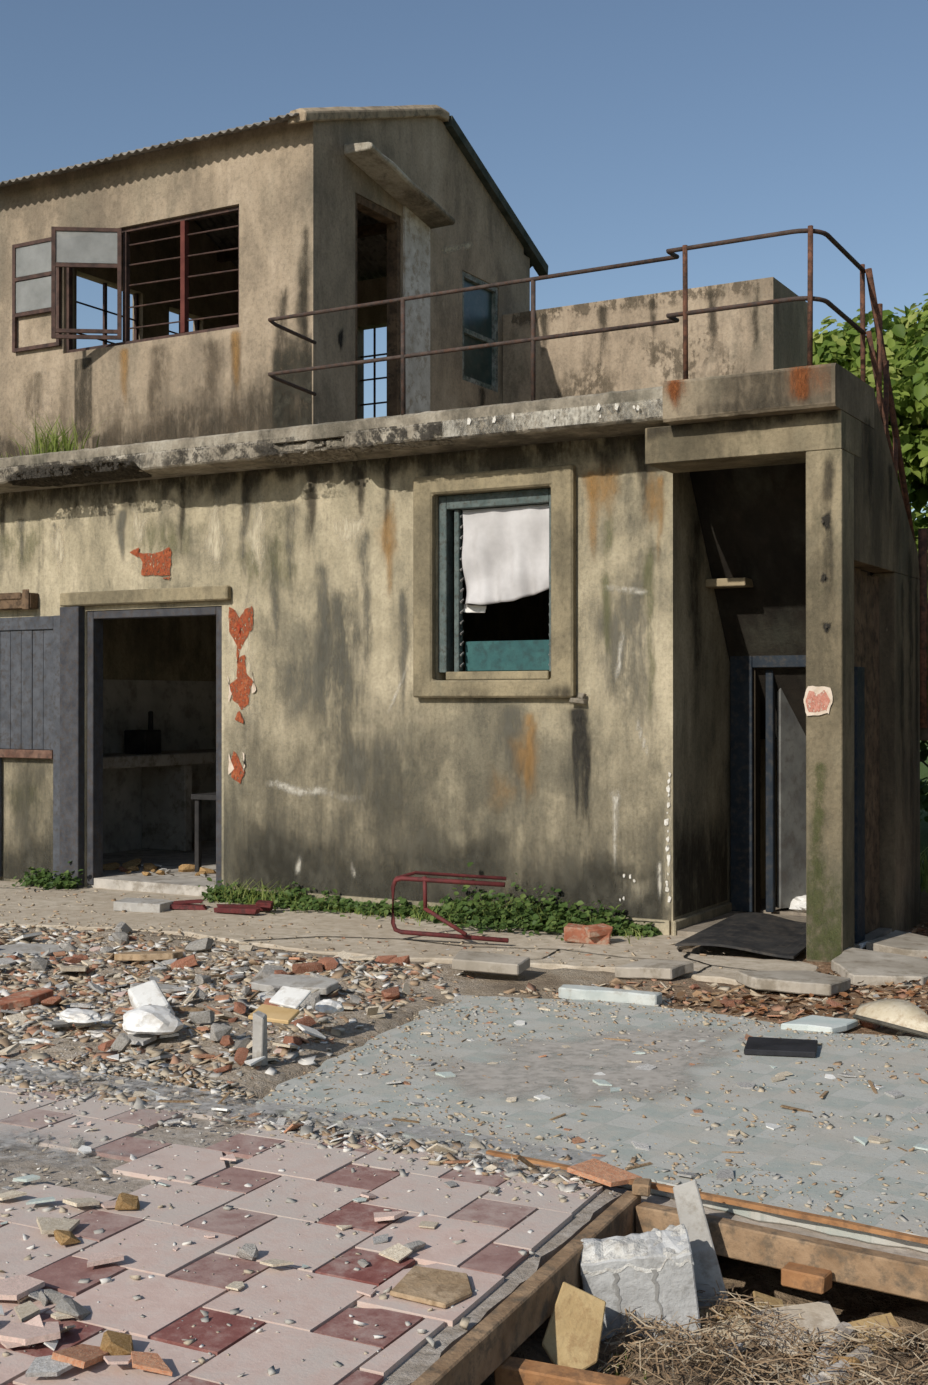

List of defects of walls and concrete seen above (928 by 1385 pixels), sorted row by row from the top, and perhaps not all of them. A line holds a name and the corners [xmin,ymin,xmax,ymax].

water stain [0,230,838,554]
rust [667,380,681,402]
rust [790,366,810,397]
water stain [242,531,291,629]
water stain [283,566,369,712]
water stain [393,594,407,700]
water stain [598,555,653,697]
water stain [556,688,590,812]
water stain [495,796,728,920]